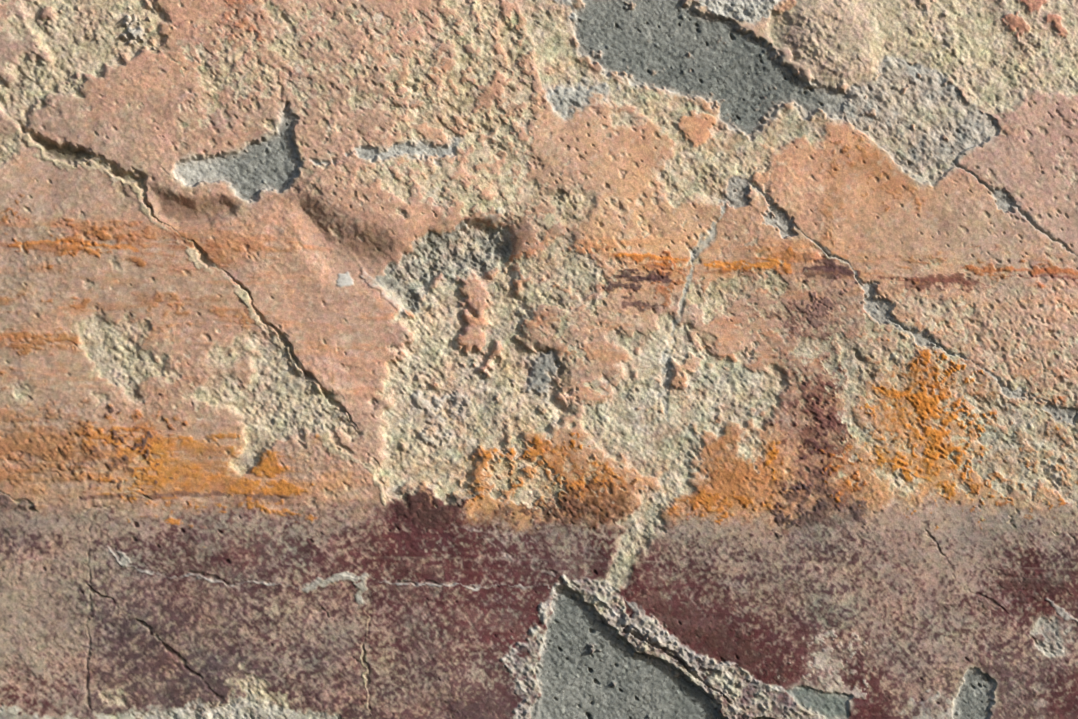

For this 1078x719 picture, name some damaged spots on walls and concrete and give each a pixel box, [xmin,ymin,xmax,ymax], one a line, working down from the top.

flaking render [0,0,178,172]
flaking render [764,0,1078,121]
crack [952,161,1078,257]
flaking render [73,310,183,413]
corrosion [0,193,318,529]
crack [0,93,390,507]
flaking render [171,0,945,719]
crack [655,176,1078,429]
corrosion [467,432,639,547]
corrosion [667,422,789,525]
flaking render [934,371,1078,515]
flaking render [97,687,129,710]